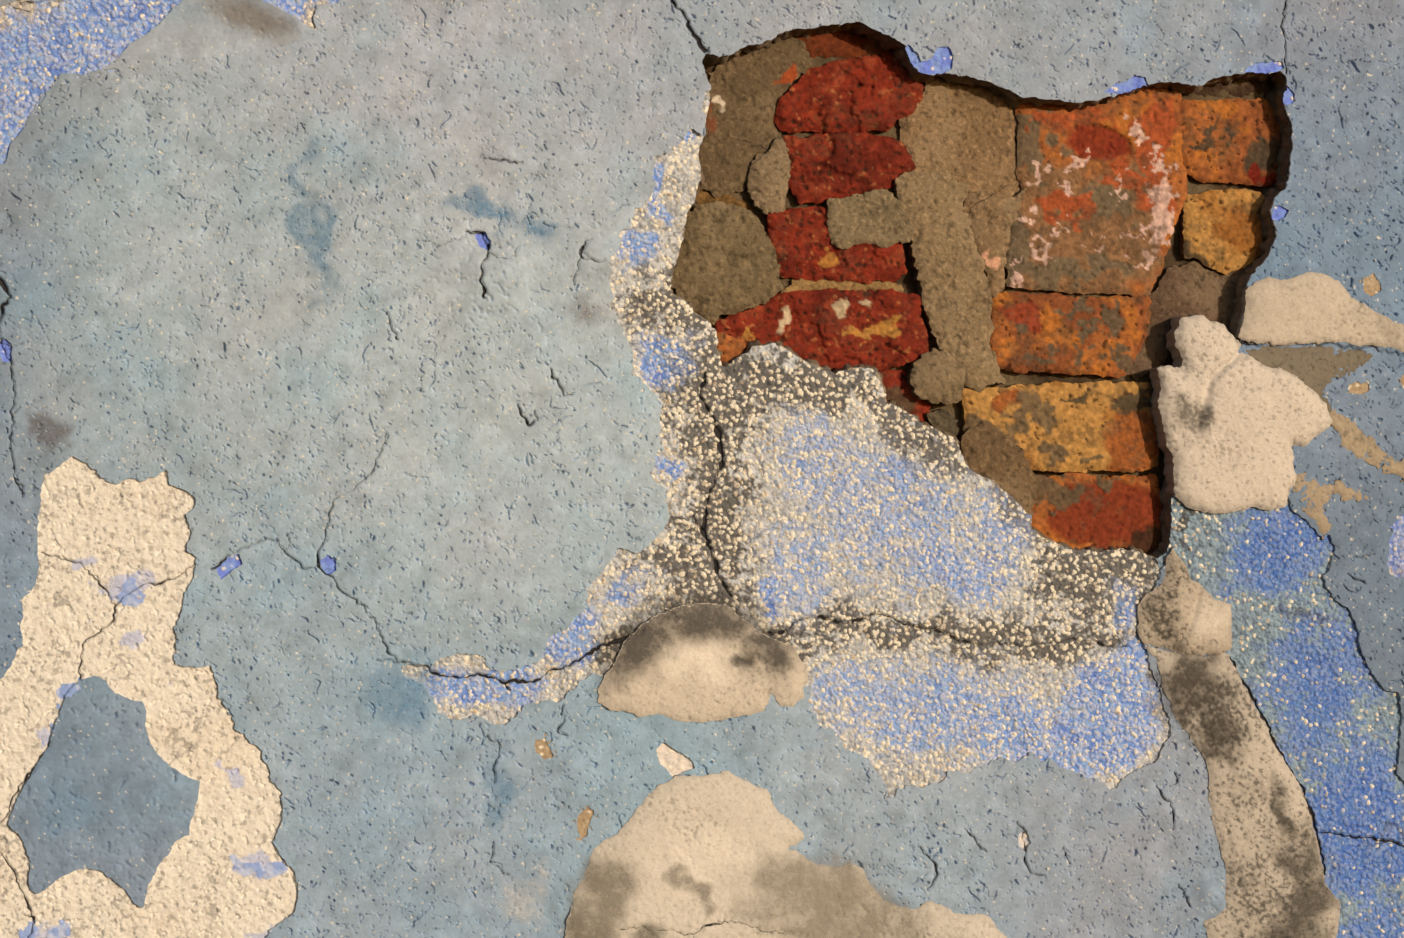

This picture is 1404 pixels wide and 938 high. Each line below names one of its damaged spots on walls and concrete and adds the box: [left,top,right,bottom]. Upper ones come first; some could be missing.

peeling [0,0,344,164]
crack [0,278,24,494]
crack [517,369,571,426]
crack [693,372,728,592]
flaking render [402,31,1404,938]
crack [1237,339,1404,356]
peeling [0,456,298,938]
crack [754,606,1127,648]
crack [1156,772,1178,829]
crack [1230,658,1404,875]